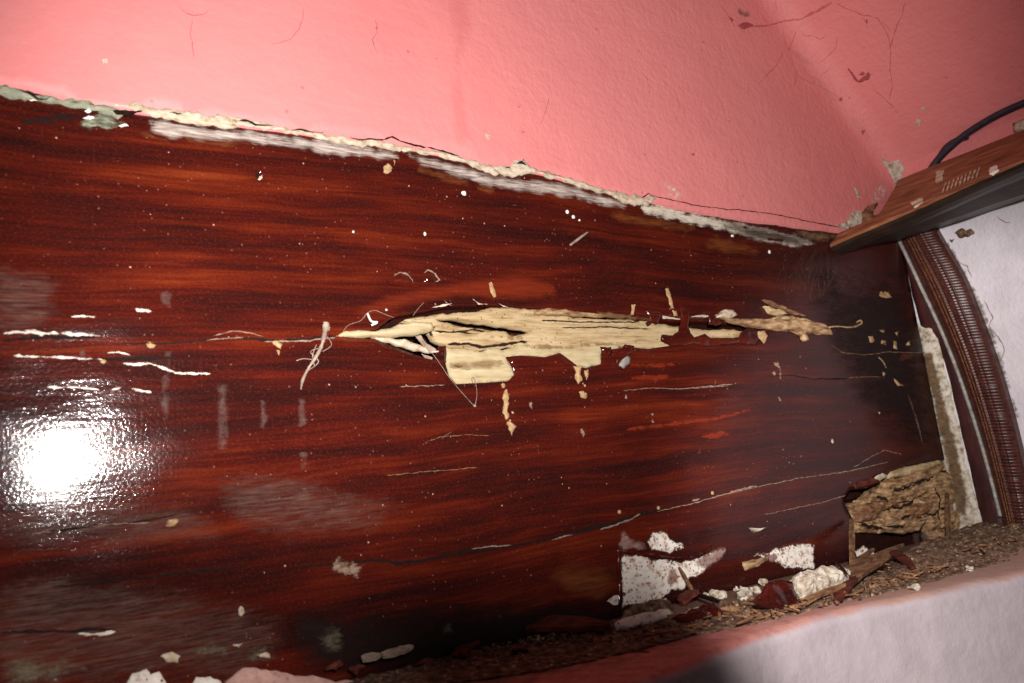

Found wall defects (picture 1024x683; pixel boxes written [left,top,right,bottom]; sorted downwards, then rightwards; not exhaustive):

peeling [848,68,871,83]
peeling [113,101,657,209]
spalling [534,308,607,318]
crack [303,450,902,566]
peeling [853,460,960,534]
peeling [607,532,724,607]
peeling [672,604,729,623]
peeling [742,544,814,610]